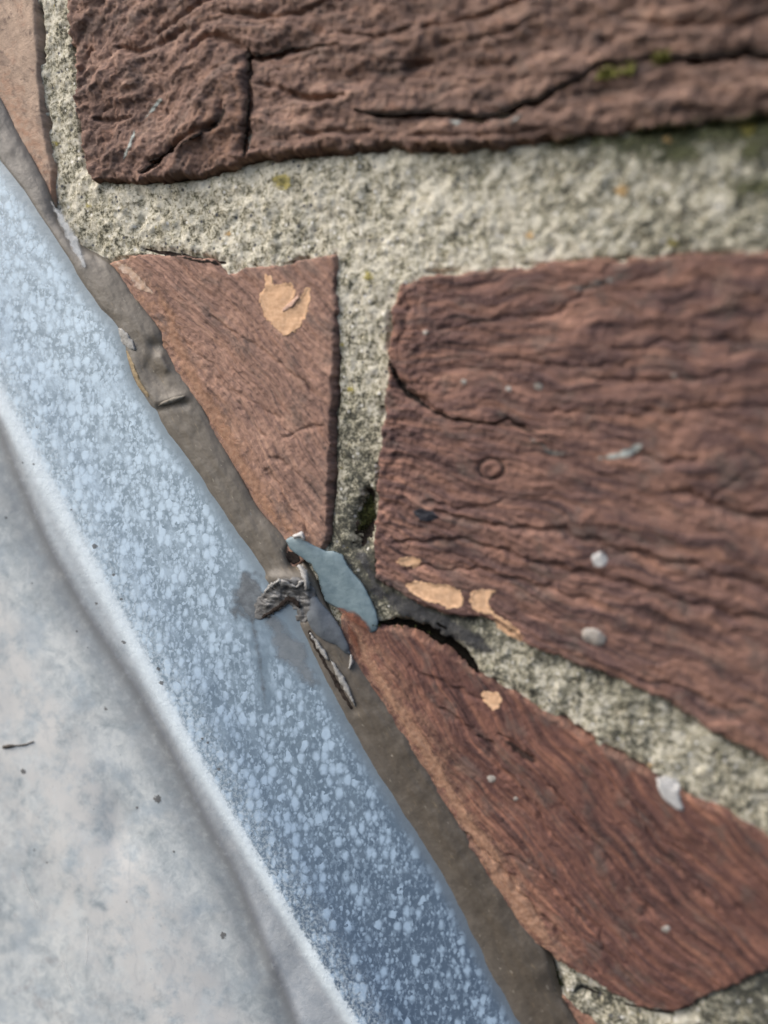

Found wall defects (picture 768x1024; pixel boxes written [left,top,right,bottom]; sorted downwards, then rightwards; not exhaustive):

crack [141,43,339,173]
crack [355,49,768,118]
spalling [259,274,311,336]
spalling [396,556,524,642]
crack [379,617,479,673]